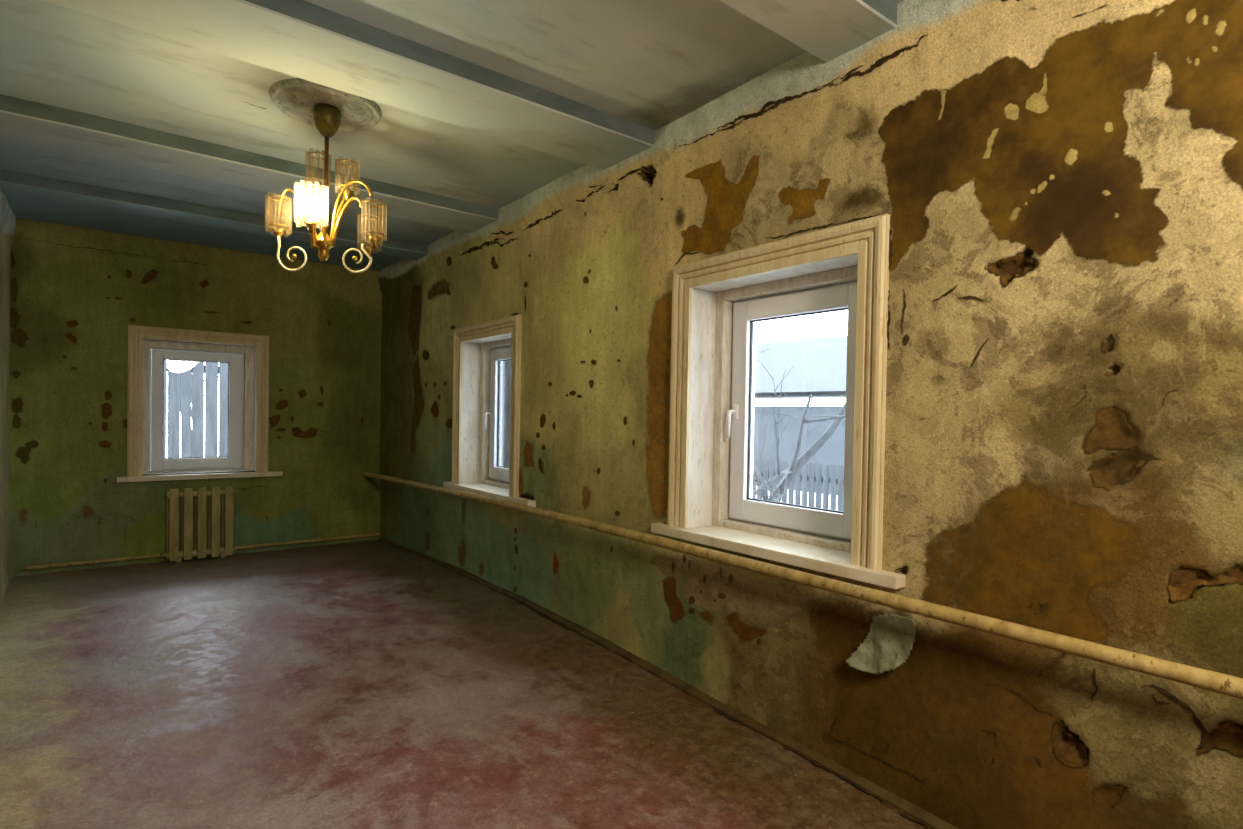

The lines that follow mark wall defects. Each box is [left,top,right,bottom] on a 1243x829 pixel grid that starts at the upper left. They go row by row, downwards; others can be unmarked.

crack [678,35,928,147]
peeling [878,0,1243,286]
crack [460,168,642,256]
peeling [681,155,760,255]
peeling [779,178,830,225]
peeling [89,390,127,448]
peeling [633,292,672,518]
peeling [923,476,1148,644]
peeling [846,613,916,675]
flaking render [1197,721,1243,757]